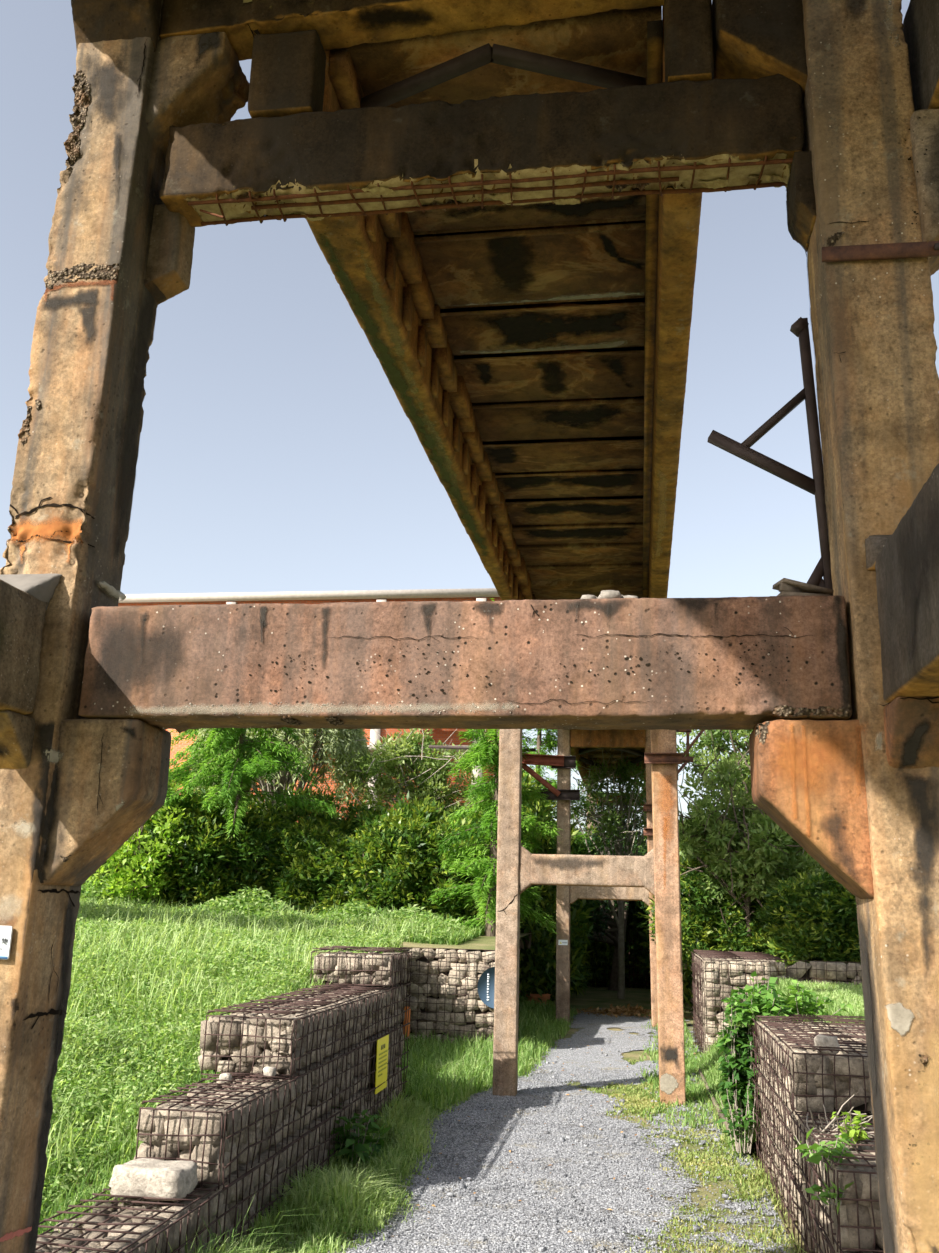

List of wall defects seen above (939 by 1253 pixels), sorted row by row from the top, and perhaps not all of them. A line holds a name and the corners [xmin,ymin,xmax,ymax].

spalling [64,69,90,165]
spalling [186,153,793,226]
damp [523,195,643,218]
spalling [45,263,119,289]
damp [44,289,97,341]
damp [468,235,642,394]
damp [540,404,624,429]
crack [9,497,95,548]
damp [99,613,178,689]
crack [329,634,478,642]
crack [573,627,809,638]
crack [24,939,67,1029]